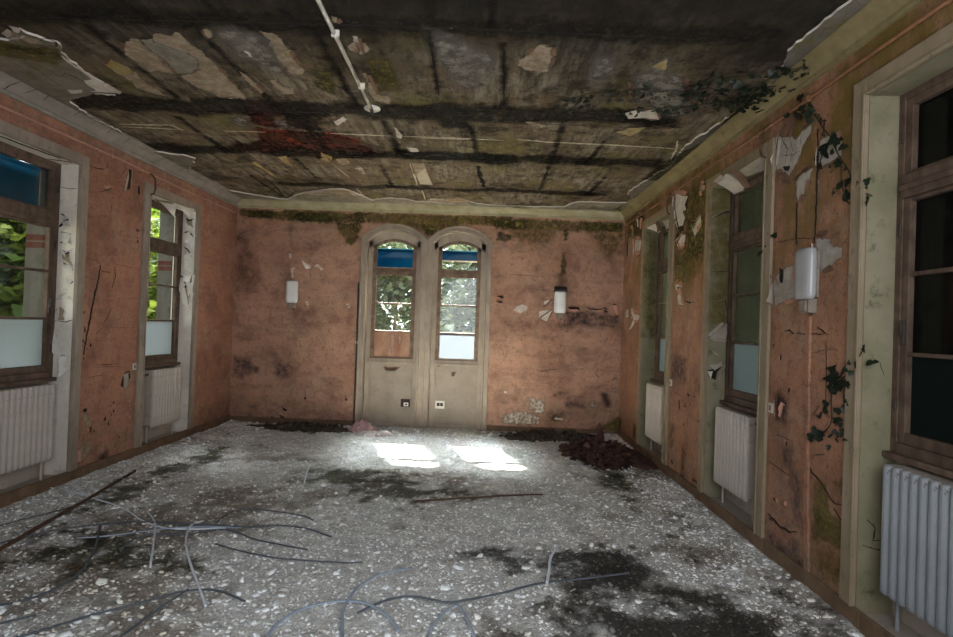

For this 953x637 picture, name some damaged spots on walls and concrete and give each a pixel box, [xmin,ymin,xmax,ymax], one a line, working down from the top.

crack [0,30,657,378]
peeling [0,26,665,211]
leakage [0,0,781,197]
leakage [240,205,644,254]
peeling [539,299,554,321]
leakage [674,185,731,323]
peeling [627,112,843,263]
peeling [766,264,797,306]
peeling [752,0,872,100]
peeling [811,230,842,274]